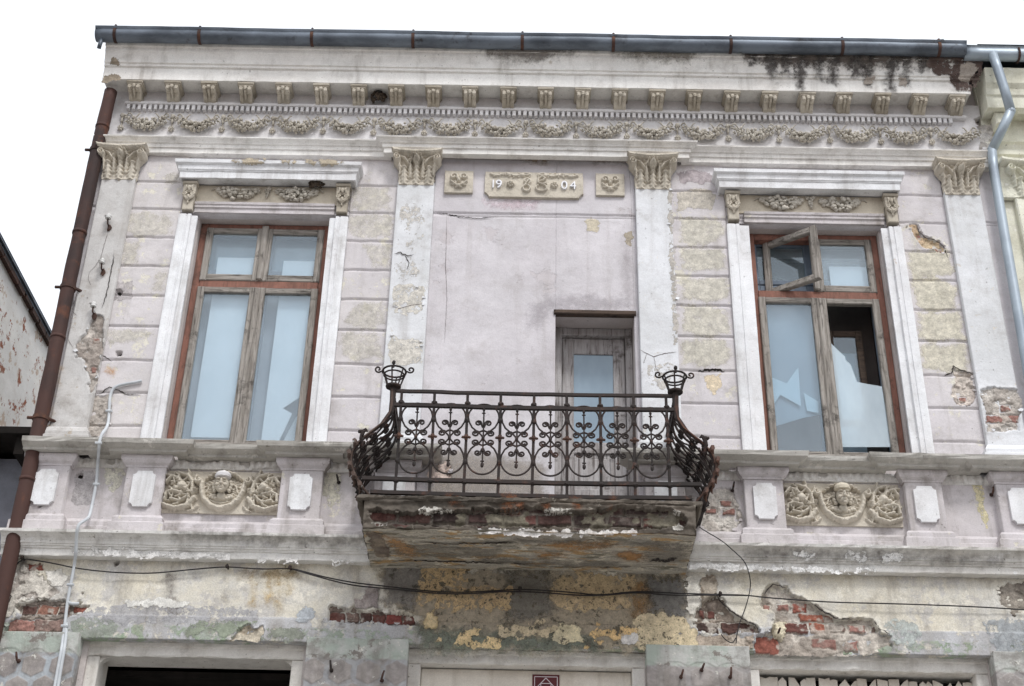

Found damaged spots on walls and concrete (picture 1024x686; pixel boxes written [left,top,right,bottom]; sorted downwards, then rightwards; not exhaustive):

leakage [742,53,958,92]
spalling [908,225,1024,432]
spalling [74,315,112,436]
peeling [69,546,231,561]
peeling [256,556,299,564]
spalling [366,505,686,558]
peeling [4,560,316,644]
spalling [329,545,922,658]
peeling [982,582,1024,652]